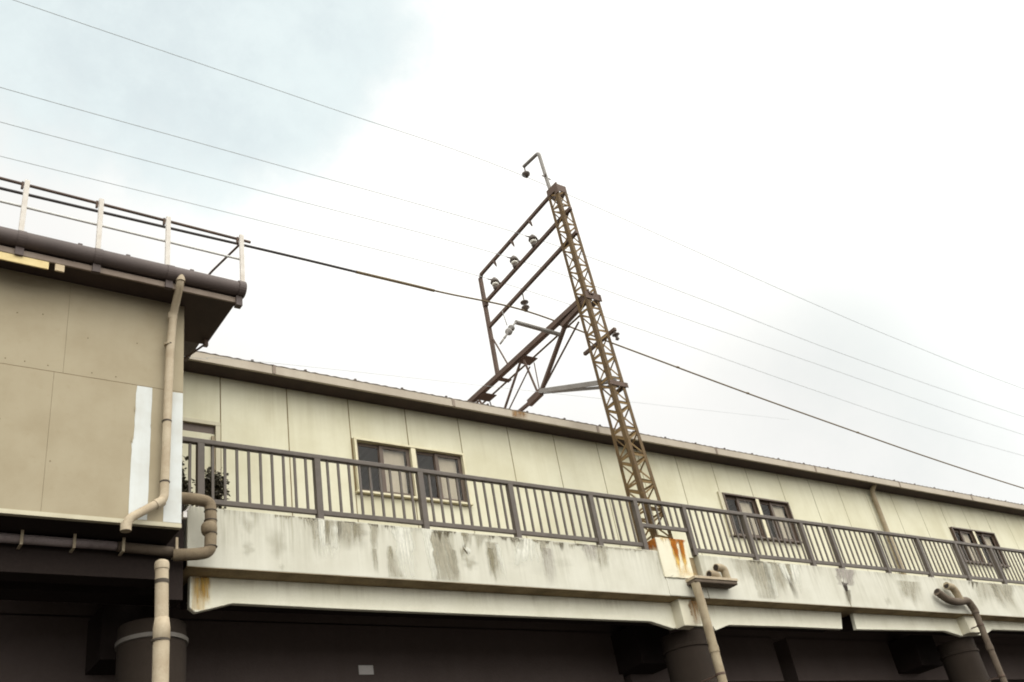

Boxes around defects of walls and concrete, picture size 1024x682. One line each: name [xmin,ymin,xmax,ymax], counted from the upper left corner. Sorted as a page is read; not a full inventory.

damp [275,515,641,579]
rust [647,538,687,569]
damp [748,560,799,595]